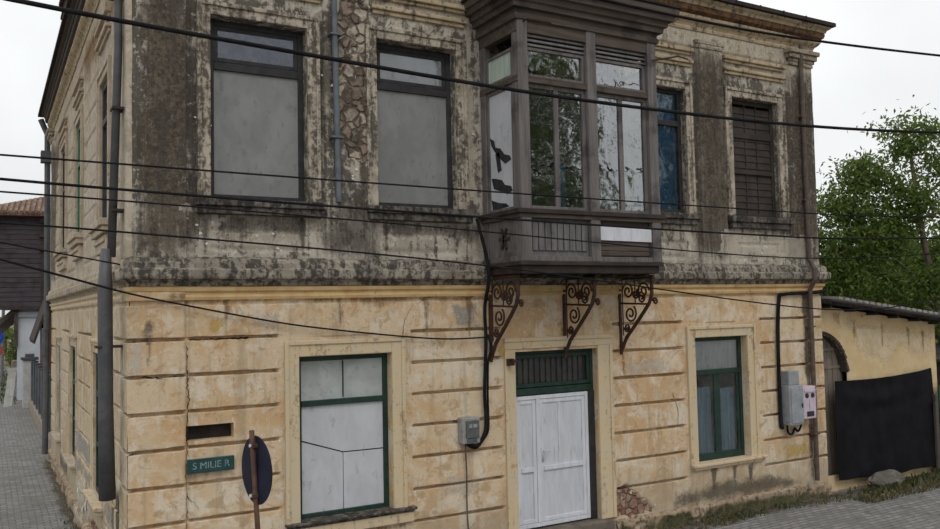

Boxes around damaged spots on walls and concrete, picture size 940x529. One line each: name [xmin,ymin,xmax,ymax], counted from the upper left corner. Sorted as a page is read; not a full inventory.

spalling [331,0,370,184]
leakage [692,60,700,123]
leakage [219,216,306,245]
leakage [324,150,418,256]
crack [141,337,249,525]
peeling [73,478,98,529]
spalling [612,485,656,519]